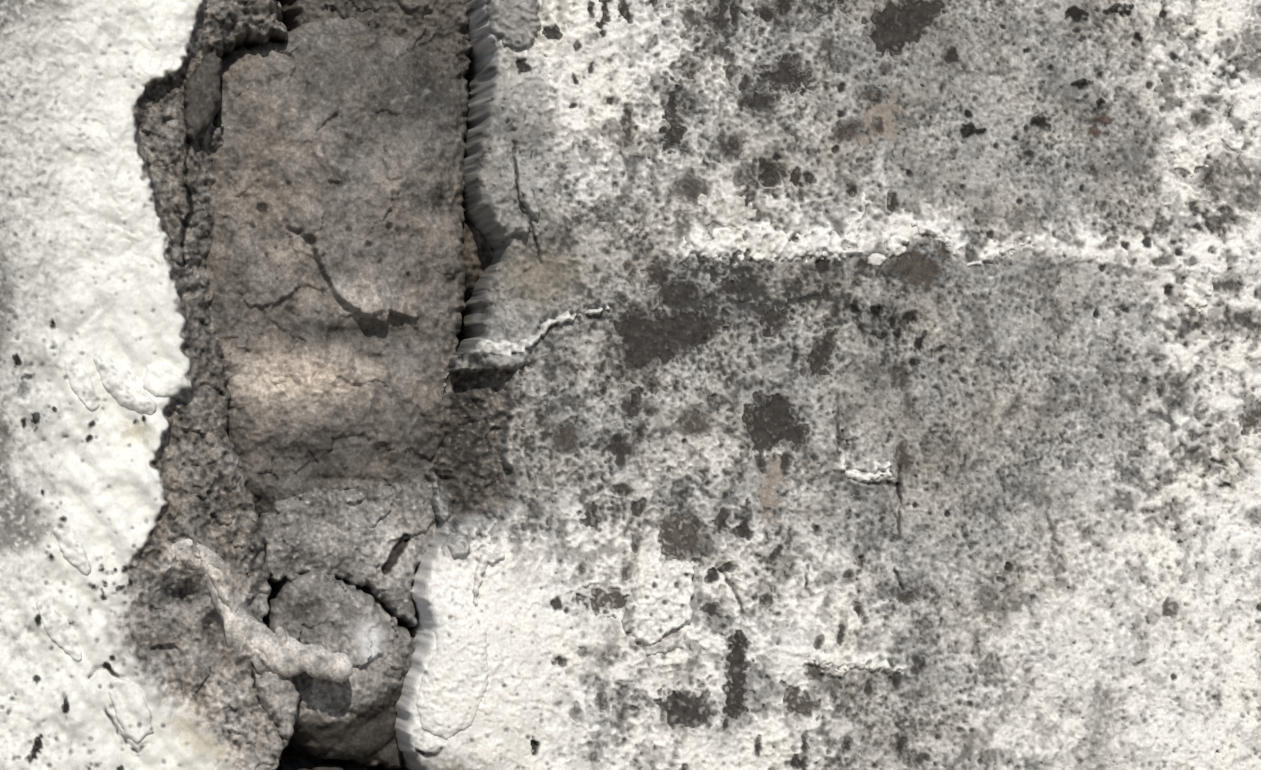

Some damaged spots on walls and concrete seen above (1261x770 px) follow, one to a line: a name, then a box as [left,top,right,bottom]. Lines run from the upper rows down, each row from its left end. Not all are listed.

spalling [108,0,300,770]
crack [871,466,902,534]
spalling [382,534,409,574]
peeling [447,537,505,605]
crack [251,670,261,704]
crack [415,748,442,757]